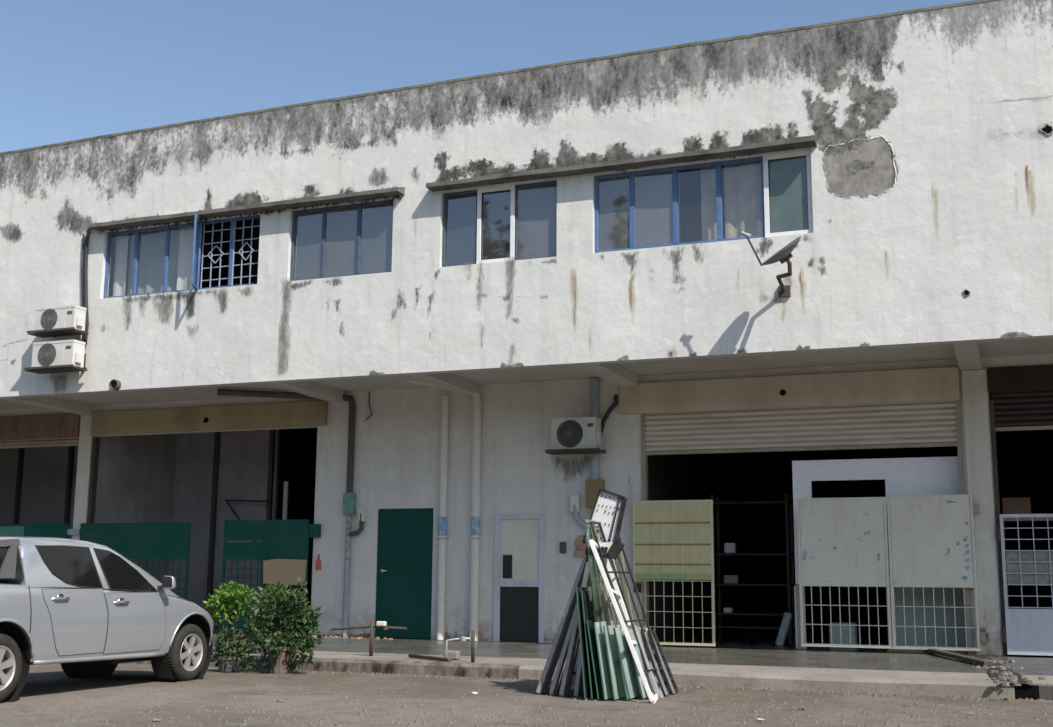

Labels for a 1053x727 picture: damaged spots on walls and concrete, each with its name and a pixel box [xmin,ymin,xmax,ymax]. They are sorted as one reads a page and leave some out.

leakage [0,0,1053,199]
peeling [803,71,898,199]
spalling [1038,123,1053,136]
leakage [58,168,401,235]
leakage [1,224,22,241]
leakage [757,237,773,255]
leakage [127,290,226,329]
leakage [279,280,311,374]
leakage [504,258,515,316]